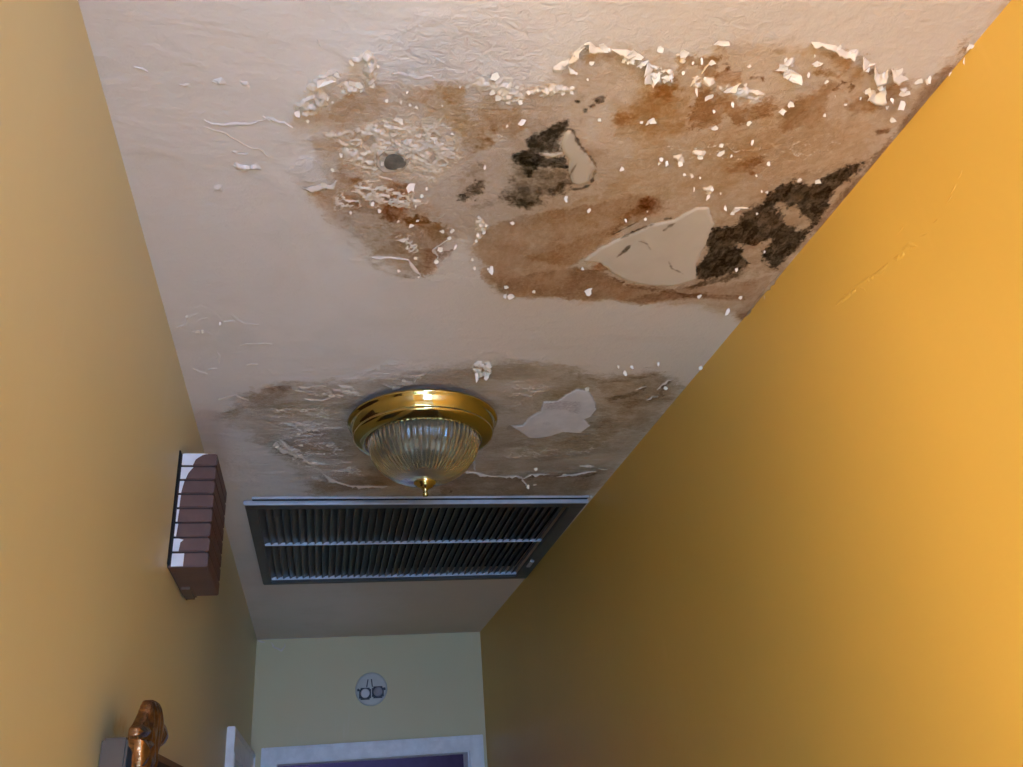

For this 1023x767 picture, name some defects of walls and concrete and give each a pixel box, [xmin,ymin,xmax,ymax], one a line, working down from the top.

peeling [293,49,379,123]
peeling [459,42,765,113]
peeling [776,42,931,123]
peeling [304,91,469,278]
peeling [470,216,493,275]
mould [513,121,568,205]
peeling [541,130,596,188]
peeling [581,125,845,286]
water stain [696,162,864,316]
peeling [465,365,634,489]